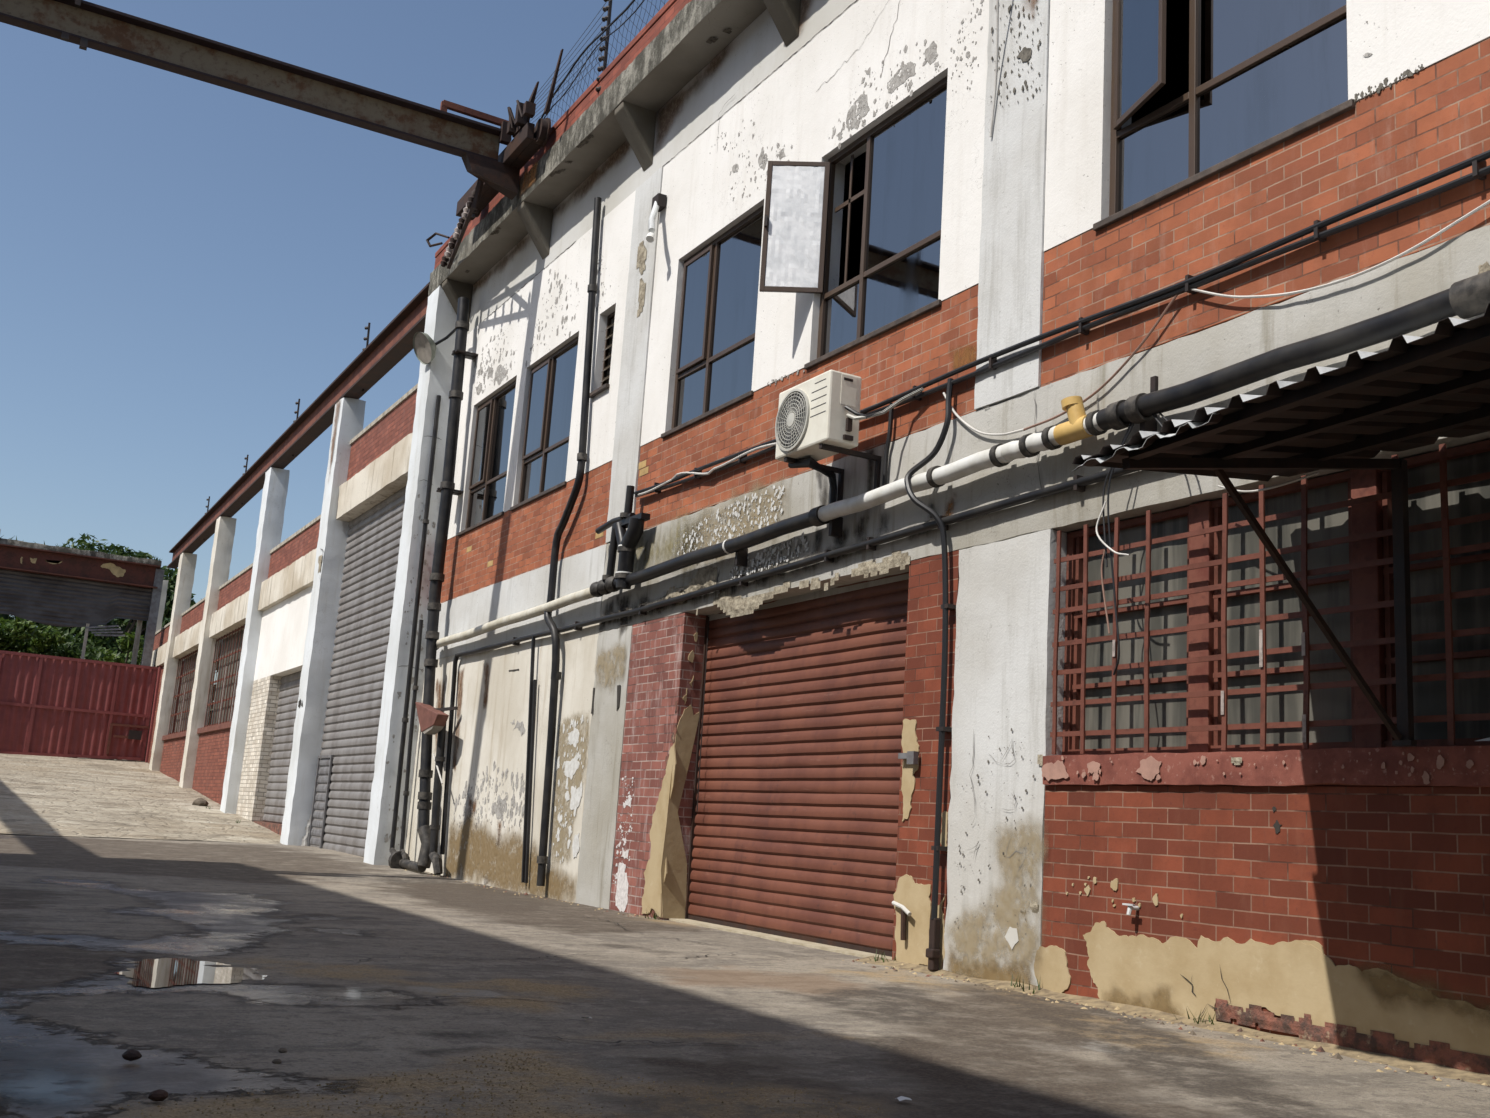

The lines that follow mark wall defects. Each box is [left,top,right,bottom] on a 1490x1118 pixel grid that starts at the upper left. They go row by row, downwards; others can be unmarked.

peeling [829,0,1041,150]
peeling [473,269,577,395]
peeling [677,485,785,556]
flaking render [551,688,595,864]
peeling [642,532,910,919]
peeling [1136,756,1162,781]
peeling [1193,755,1256,776]
peeling [1341,750,1474,785]
damp [445,816,574,900]
damp [950,825,1044,985]
peeling [893,719,1112,969]
peeling [1034,945,1071,993]